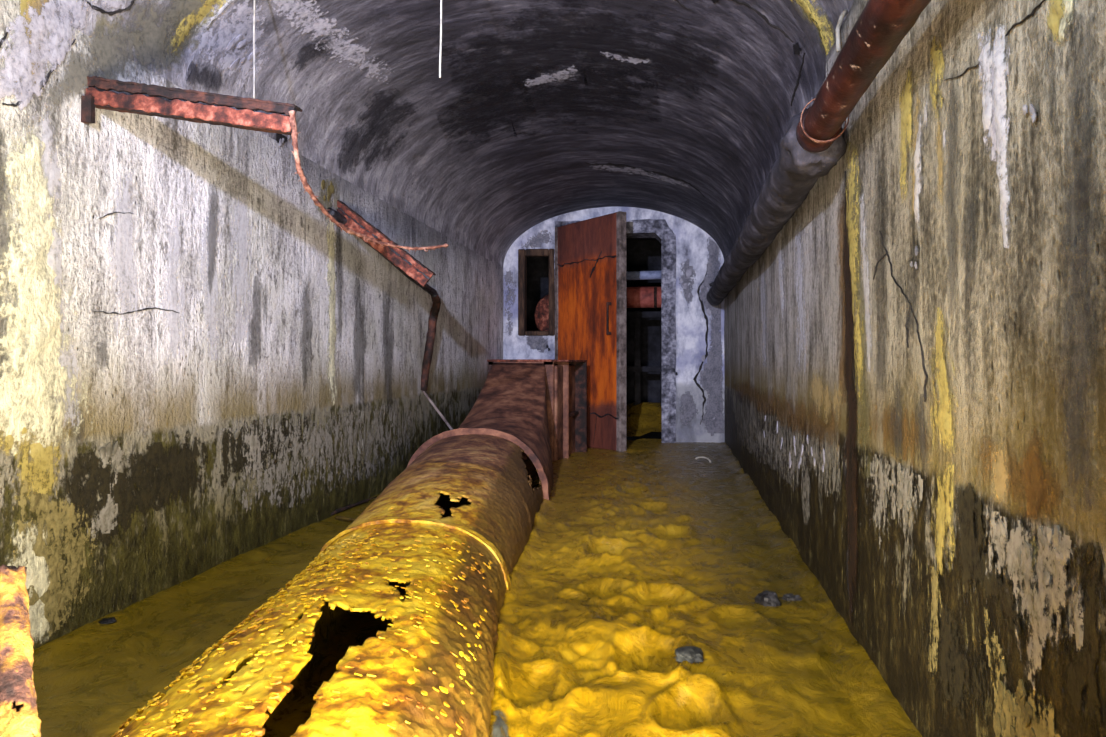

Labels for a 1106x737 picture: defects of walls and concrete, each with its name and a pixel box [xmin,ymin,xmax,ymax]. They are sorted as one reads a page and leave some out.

crack [944,62,980,81]
leakage [978,29,1010,247]
crack [1005,0,1046,36]
crack [94,307,179,315]
rust [733,171,858,623]
crack [873,231,928,402]
leakage [930,307,958,449]
leakage [918,465,1024,725]
peeling [984,505,1084,737]
leakage [1063,542,1106,737]